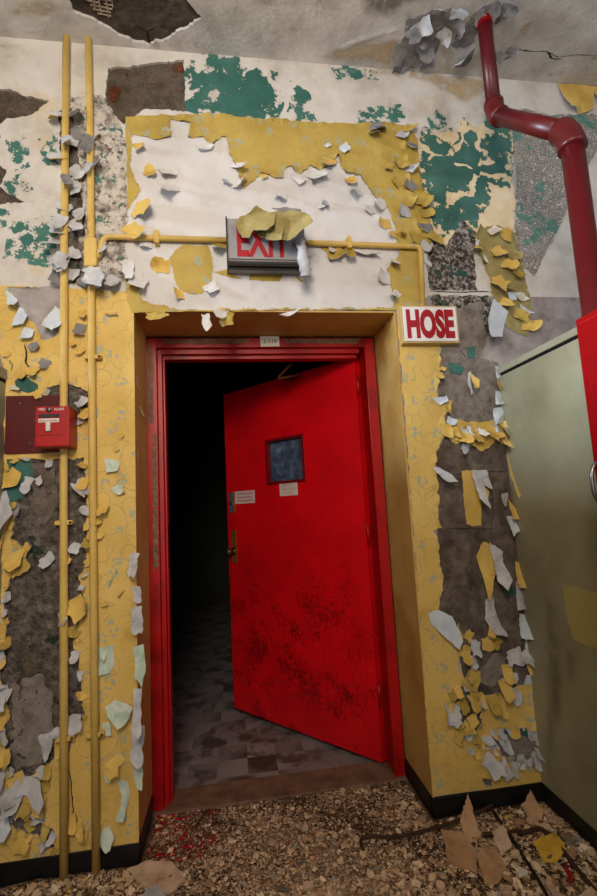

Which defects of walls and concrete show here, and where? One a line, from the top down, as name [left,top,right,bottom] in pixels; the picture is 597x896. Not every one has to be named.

flaking render [70,0,201,43]
peeling [331,65,379,81]
peeling [391,0,519,75]
crack [496,46,597,64]
peeling [522,83,597,165]
peeling [291,142,351,185]
peeling [0,54,317,425]
peeling [306,247,381,271]
peeling [105,432,125,473]
peeling [433,366,521,536]
peeling [0,457,146,856]
peeling [428,561,546,782]